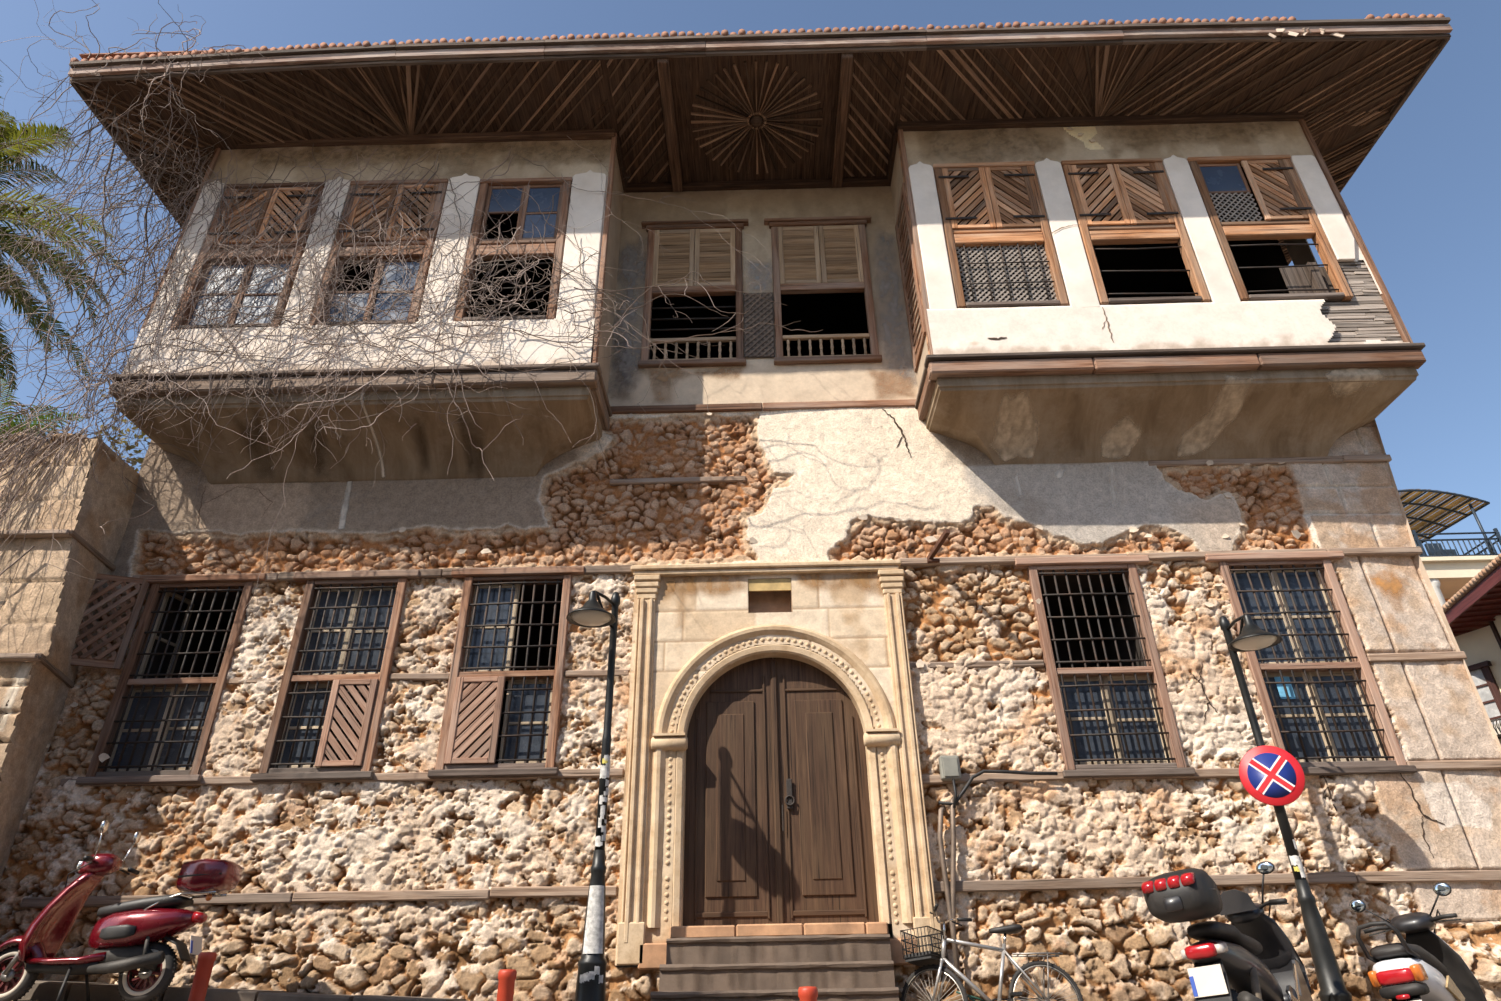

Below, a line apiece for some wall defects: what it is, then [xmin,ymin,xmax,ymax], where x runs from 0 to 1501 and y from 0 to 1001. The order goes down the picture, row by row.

flaking render [1279,260,1403,343]
peeling [993,393,1038,461]
peeling [1102,419,1141,458]
flaking render [1158,376,1318,551]
flaking render [131,413,788,670]
flaking render [828,505,1267,762]
crack [1400,773,1445,858]